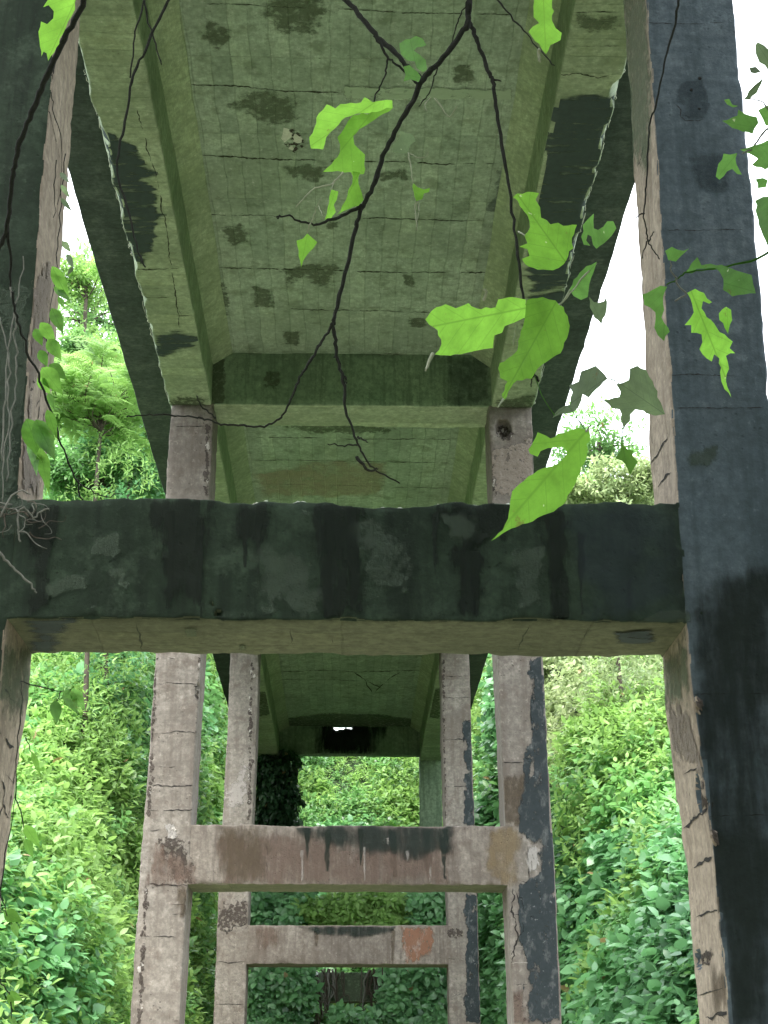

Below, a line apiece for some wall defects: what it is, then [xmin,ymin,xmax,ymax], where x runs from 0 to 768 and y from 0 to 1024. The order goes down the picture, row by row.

water stain [228,91,298,124]
spalling [281,128,304,153]
peeling [492,425,533,504]
water stain [149,499,215,615]
water stain [236,461,383,619]
water stain [0,505,75,717]
water stain [504,758,531,825]
water stain [526,835,539,871]
spalling [217,901,248,934]
rust [401,927,434,964]
crack [510,848,529,985]
water stain [712,973,726,1009]